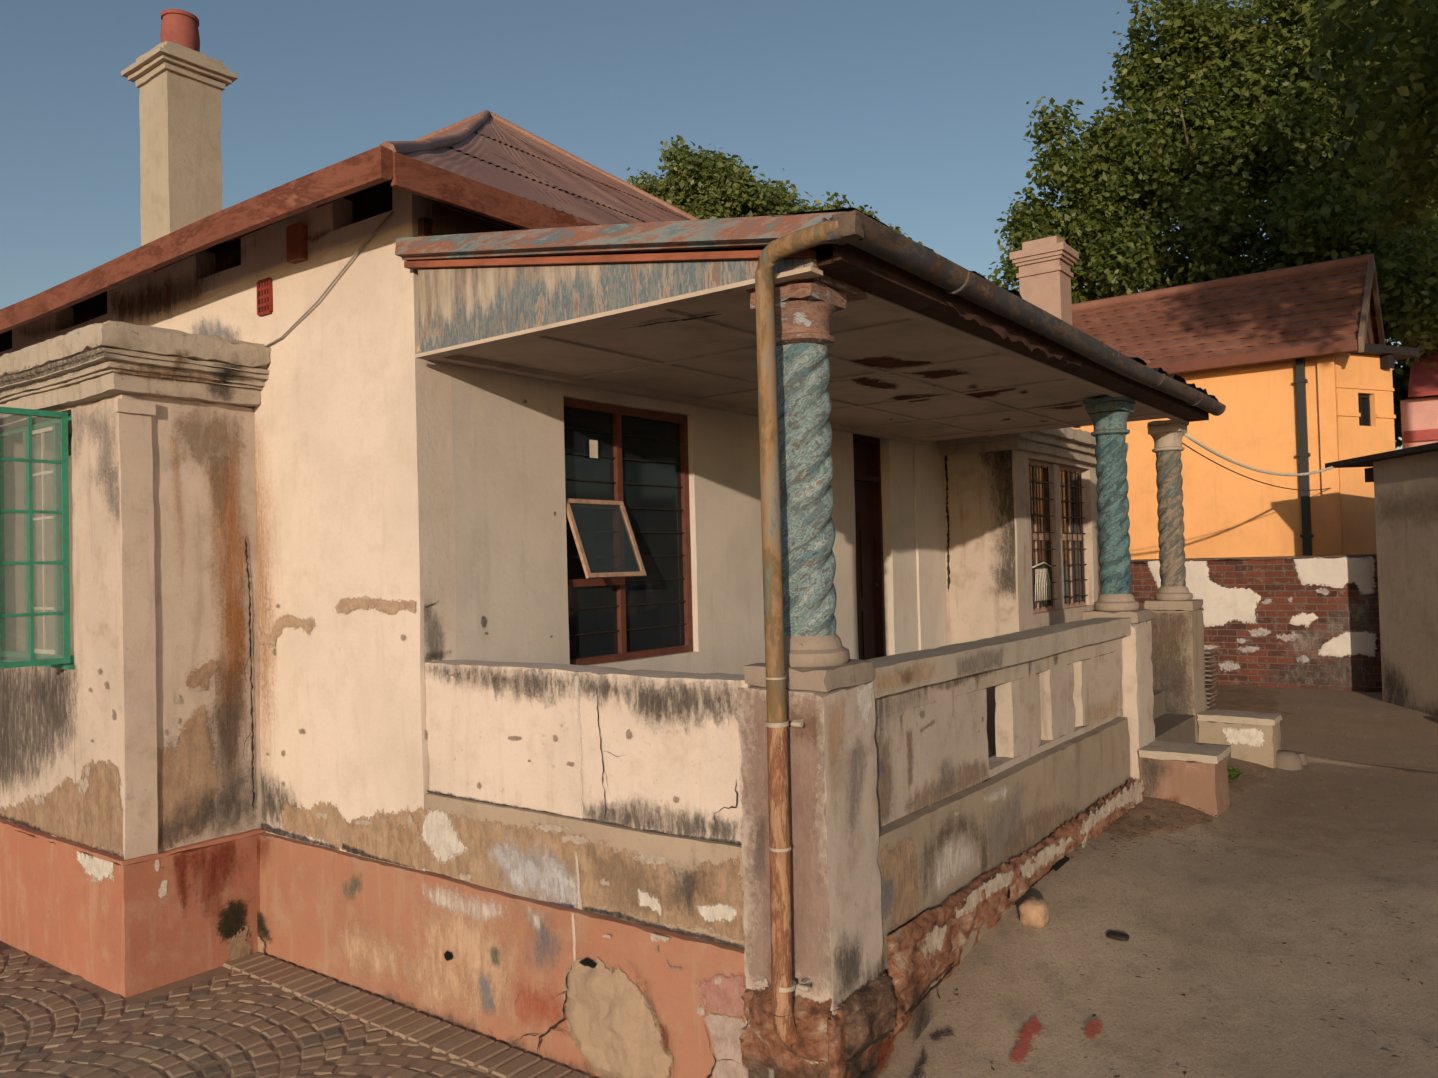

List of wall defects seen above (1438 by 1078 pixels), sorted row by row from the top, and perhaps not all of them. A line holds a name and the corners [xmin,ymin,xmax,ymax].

damp [175,410,238,516]
flaking render [258,604,316,656]
flaking render [335,595,416,615]
flaking render [1145,561,1161,589]
damp [1151,612,1194,715]
flaking render [1184,556,1378,672]
damp [0,667,76,786]
damp [424,605,771,985]
damp [786,649,1003,994]
flaking render [281,781,682,1013]
flaking render [696,777,1146,1078]